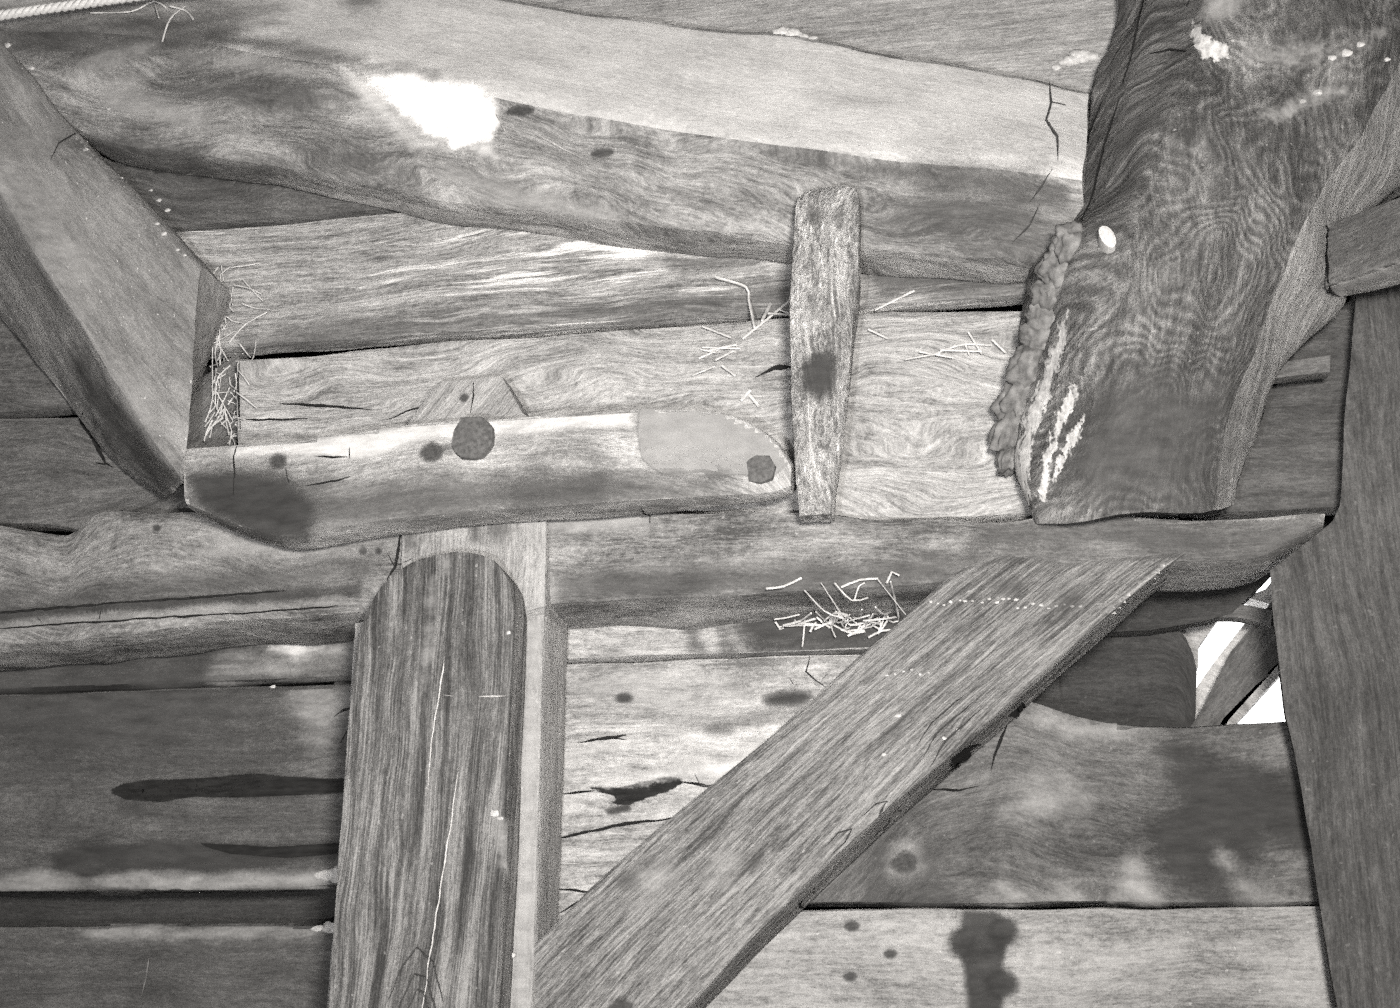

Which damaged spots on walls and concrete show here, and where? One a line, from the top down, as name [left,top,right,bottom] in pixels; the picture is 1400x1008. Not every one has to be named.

crack [1012,0,1186,243]
leakage [189,469,676,539]
leakage [12,841,339,889]
leakage [949,912,1018,1008]